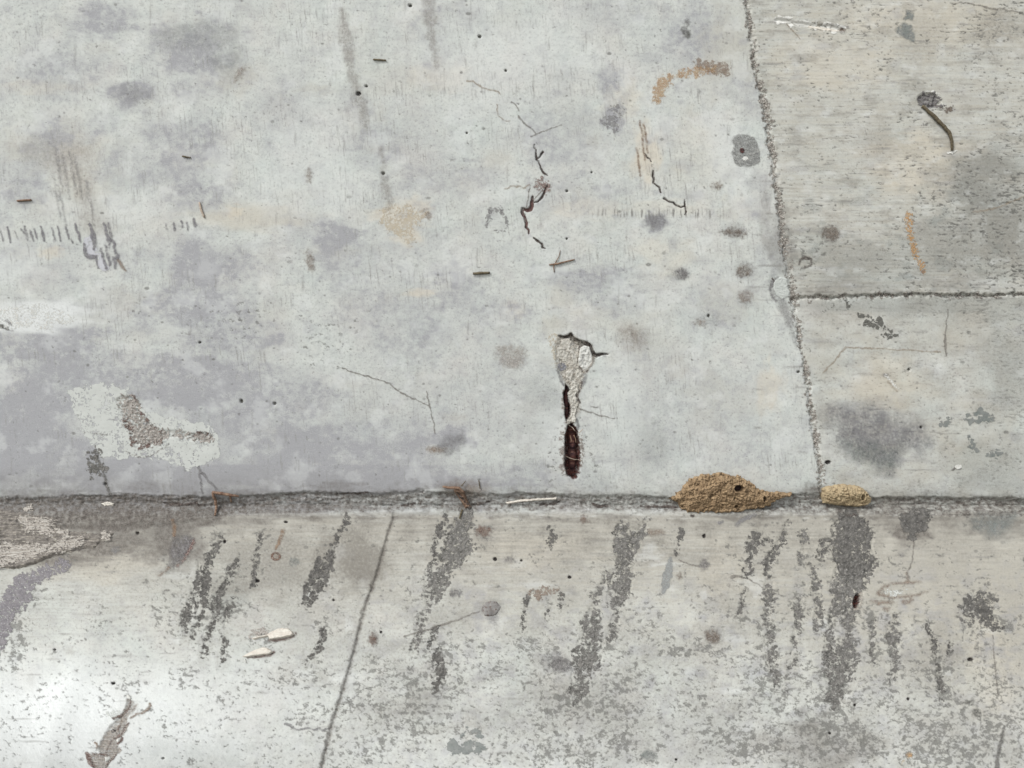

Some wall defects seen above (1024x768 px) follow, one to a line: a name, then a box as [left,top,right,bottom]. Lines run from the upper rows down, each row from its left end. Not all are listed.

rust [652,58,729,103]
crack [468,81,557,249]
crack [645,154,687,215]
rust [904,212,926,274]
peeling [67,382,220,480]
crack [337,366,435,433]
spalling [556,333,608,479]
peeling [0,504,114,569]